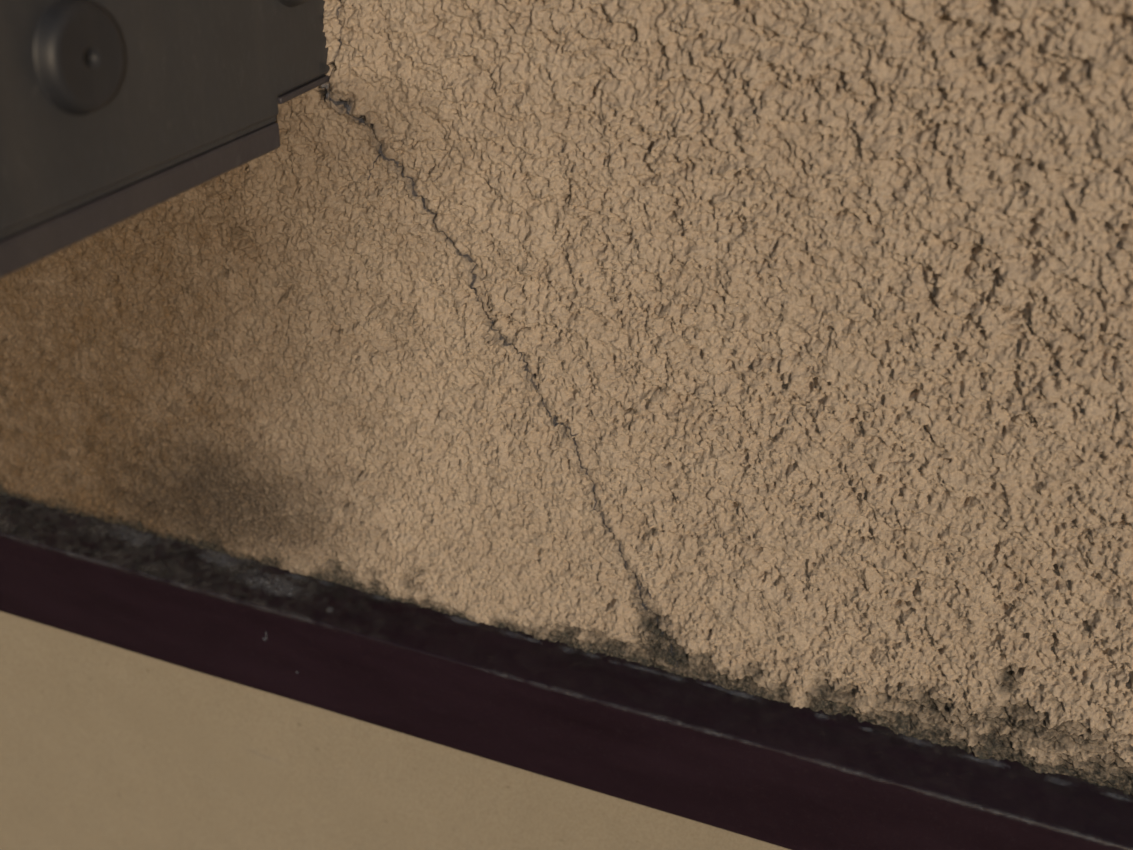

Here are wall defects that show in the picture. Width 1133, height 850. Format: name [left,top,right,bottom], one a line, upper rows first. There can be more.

crack [327,1,680,672]
water stain [299,565,472,622]
water stain [494,614,788,703]
water stain [809,666,1133,796]